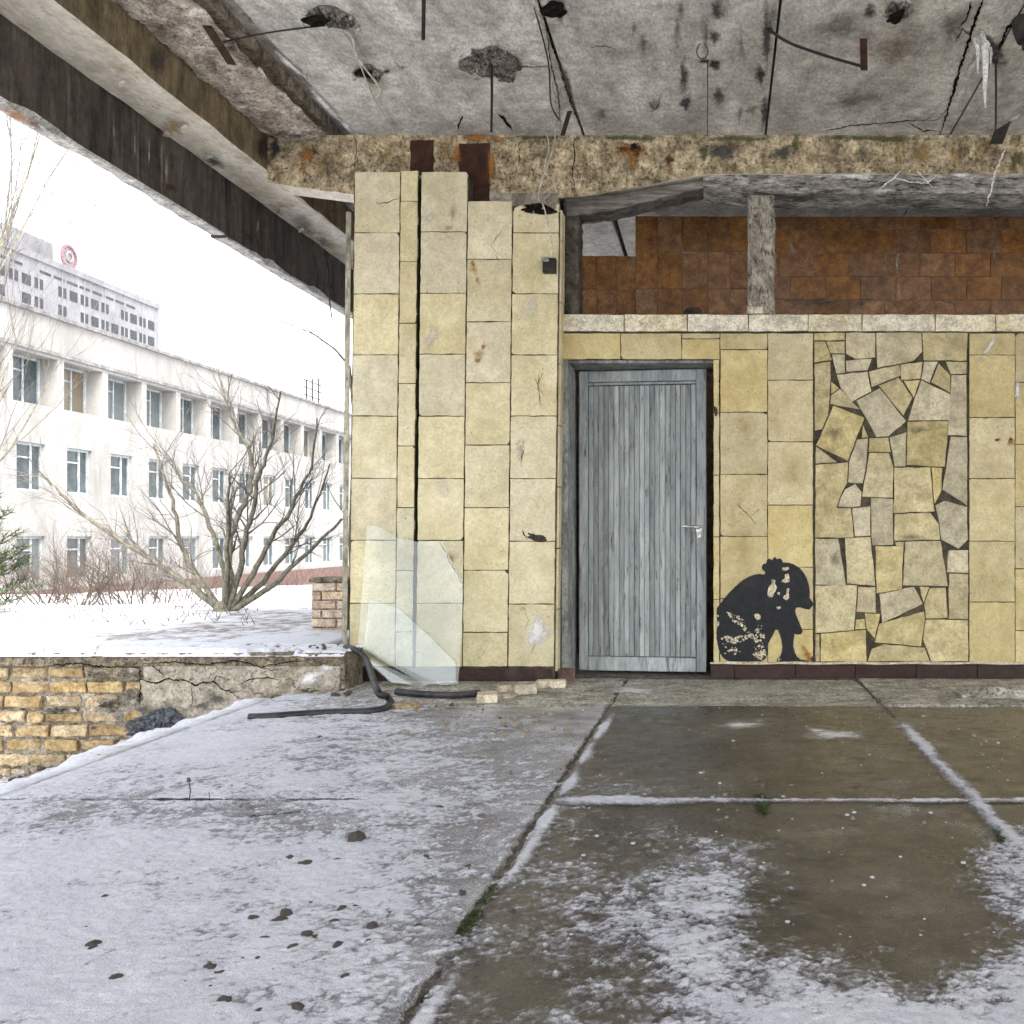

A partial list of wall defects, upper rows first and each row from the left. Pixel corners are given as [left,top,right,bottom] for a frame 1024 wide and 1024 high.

spalling [300,6,360,34]
spalling [540,0,569,21]
spalling [865,0,912,24]
spalling [352,65,390,84]
spalling [458,46,548,84]
crack [826,0,1012,135]
corrosion [618,143,642,170]
spalling [518,200,558,215]
crack [43,658,324,708]